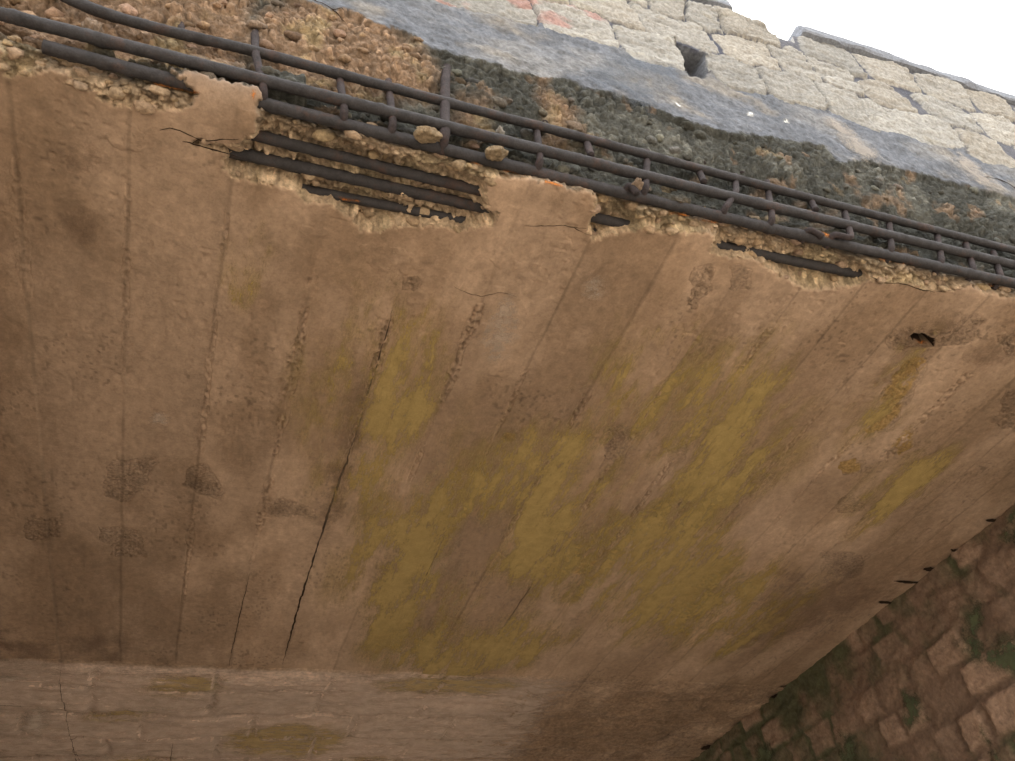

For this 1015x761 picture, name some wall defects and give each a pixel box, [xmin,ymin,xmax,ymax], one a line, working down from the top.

crack [162,128,240,158]
spalling [0,0,1015,298]
crack [229,578,249,664]
crack [283,312,392,661]
water stain [309,303,816,694]
water stain [857,448,956,536]